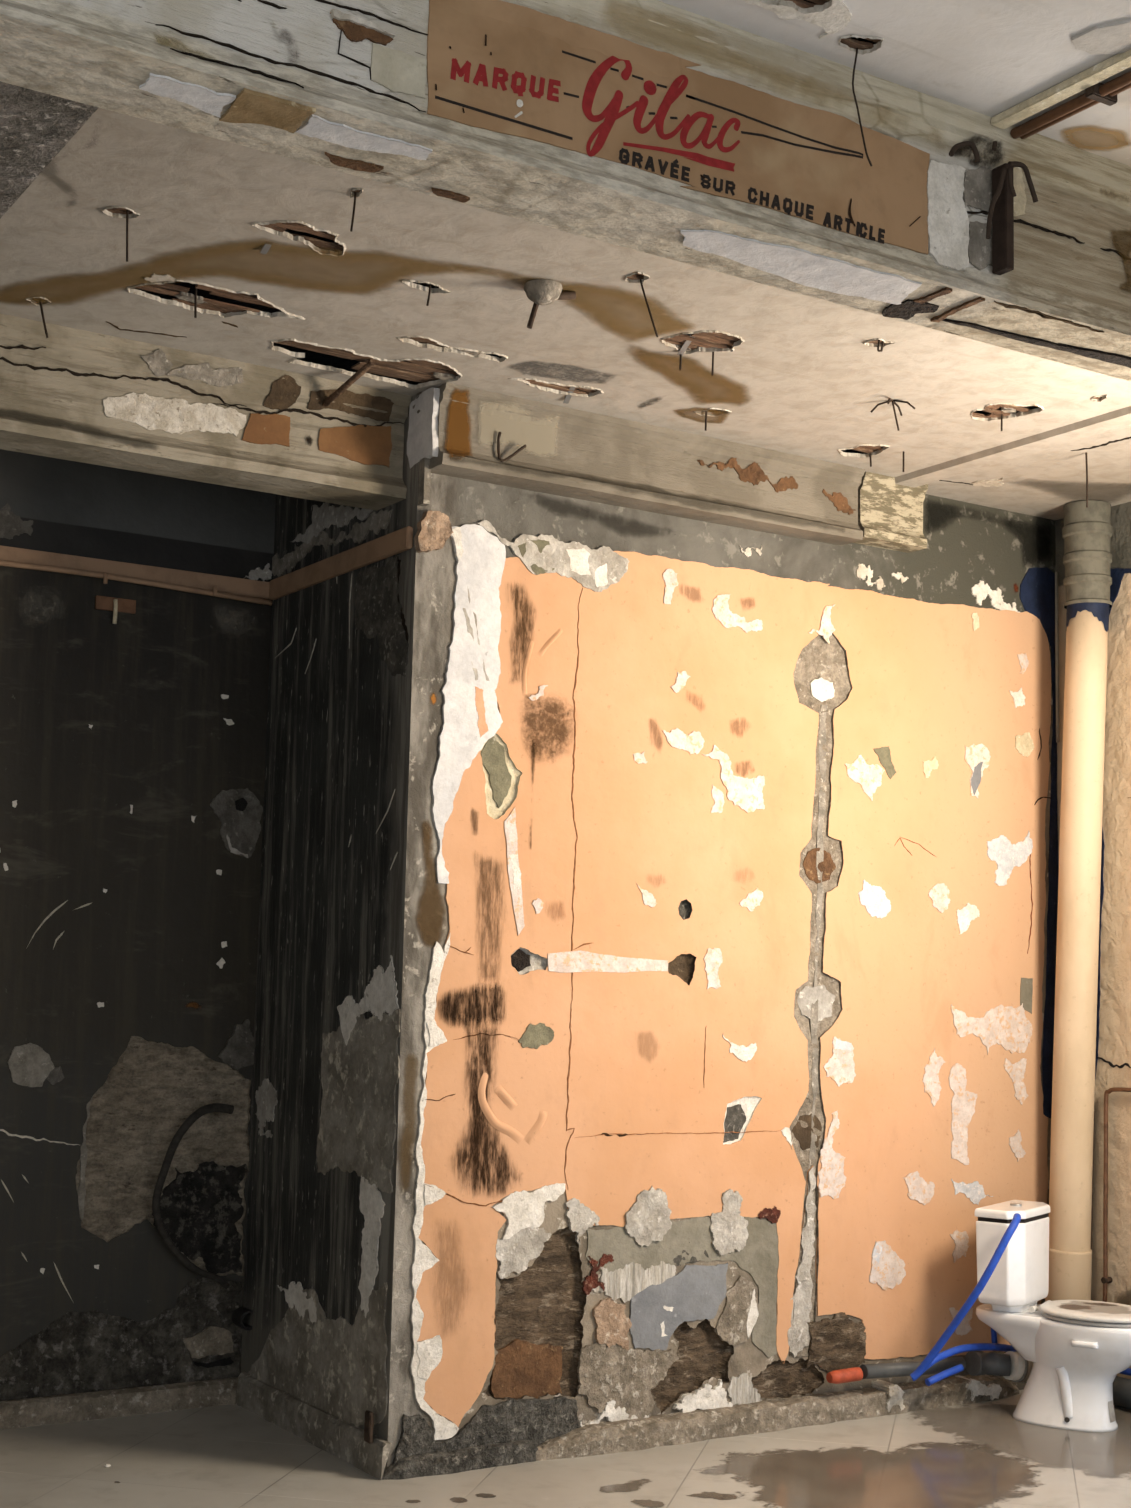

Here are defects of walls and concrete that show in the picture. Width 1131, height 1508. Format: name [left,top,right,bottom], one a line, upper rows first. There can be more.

crack [156,0,428,112]
water stain [0,241,534,304]
water stain [561,284,748,423]
peeling [1109,568,1131,614]
peeling [1095,826,1105,1077]
flaking render [0,955,401,1427]
flaking render [410,934,459,1440]
water stain [441,860,512,1193]
peeling [518,1023,554,1049]
flaking render [723,1096,762,1145]
peeling [824,1037,856,1087]
flaking render [482,1110,866,1427]